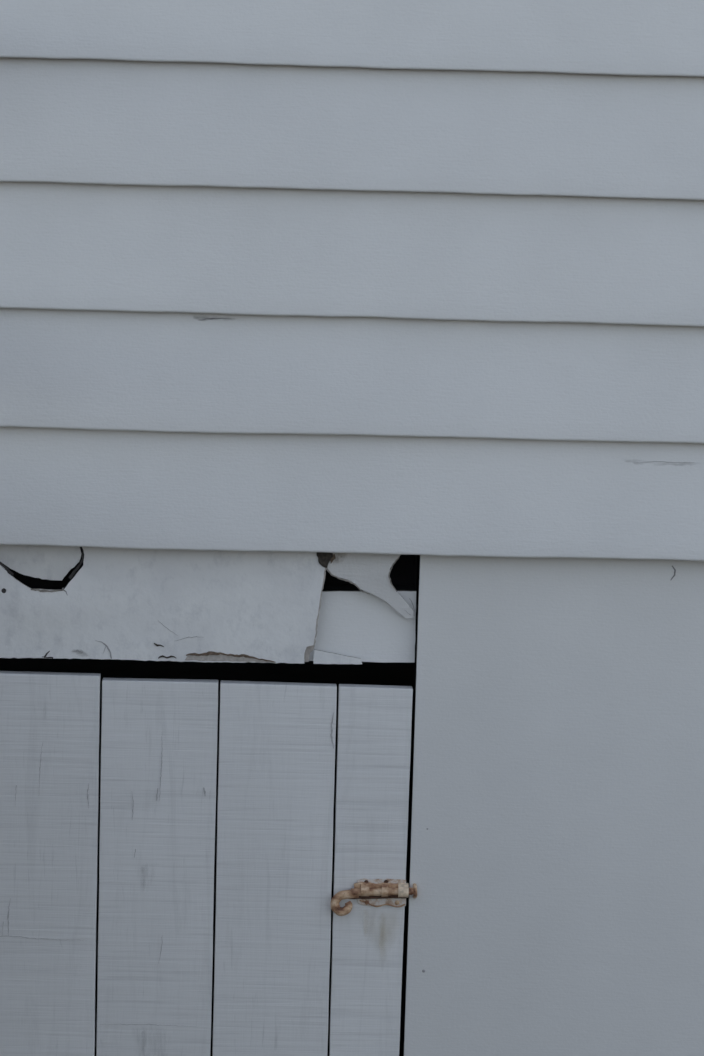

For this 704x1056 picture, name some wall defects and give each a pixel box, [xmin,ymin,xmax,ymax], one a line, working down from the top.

spalling [0,547,84,594]
spalling [388,555,417,592]
spalling [304,554,369,662]
rust [351,895,406,907]